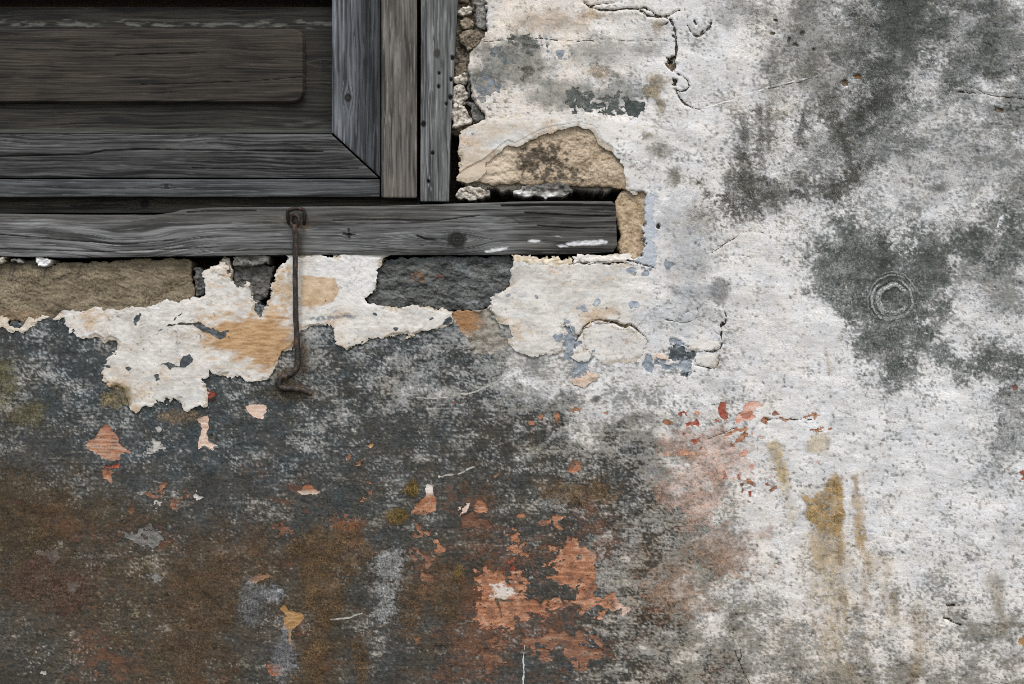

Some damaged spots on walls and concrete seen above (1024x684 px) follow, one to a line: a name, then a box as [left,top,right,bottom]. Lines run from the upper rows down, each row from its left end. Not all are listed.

crack [483,3,712,110]
flaking render [0,33,720,454]
water stain [696,0,1024,450]
peeling [86,424,131,483]
peeling [297,484,320,495]
corrosion [803,473,865,569]